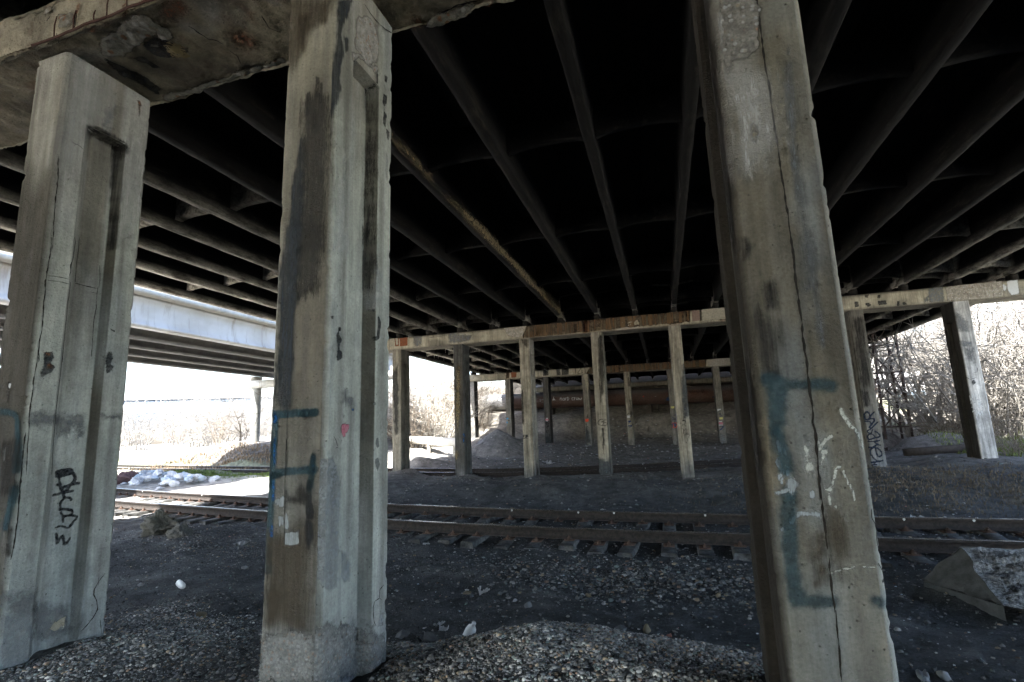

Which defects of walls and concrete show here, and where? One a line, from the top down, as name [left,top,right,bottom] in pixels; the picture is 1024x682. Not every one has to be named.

crack [11,142,100,558]
spalling [30,0,190,68]
leakage [273,0,352,409]
spalling [718,0,762,74]
crack [756,0,842,681]